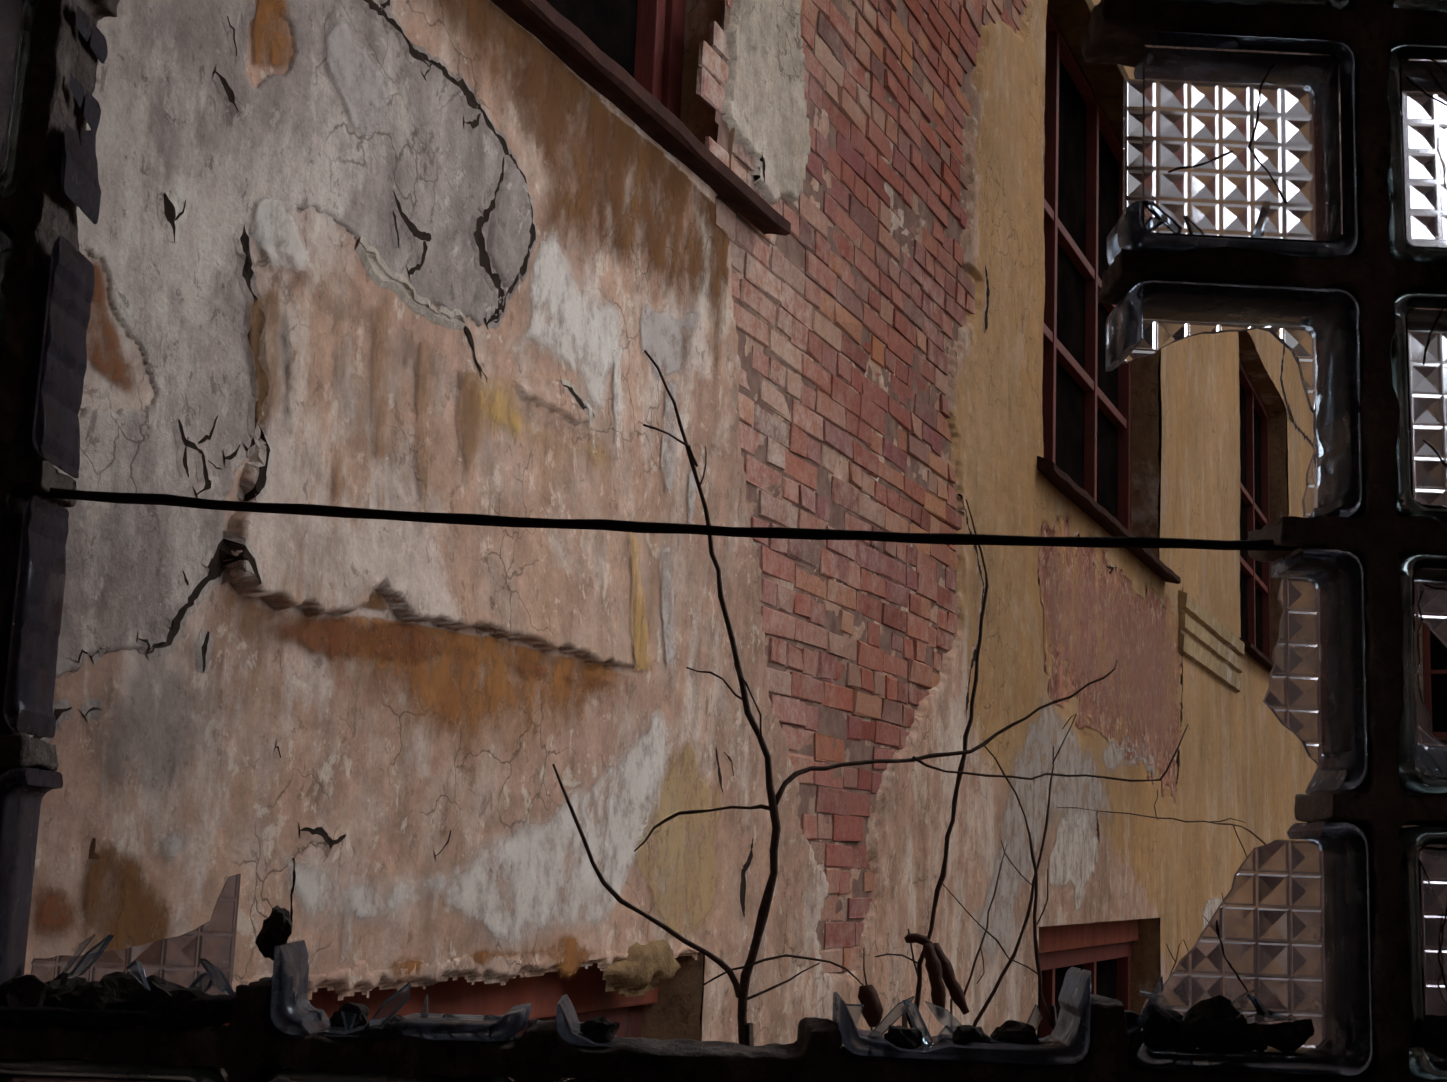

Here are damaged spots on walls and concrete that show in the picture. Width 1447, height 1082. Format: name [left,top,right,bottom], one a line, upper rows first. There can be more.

crack [1406,57,1447,106]
crack [172,223,274,503]
peeling [53,0,532,678]
peeling [513,374,594,426]
spalling [696,0,1027,974]
crack [1423,305,1445,365]
crack [1423,439,1447,468]
crack [71,531,264,673]
crack [29,698,103,742]
spalling [978,515,1183,958]
spalling [307,743,720,1001]
peeling [232,970,273,992]